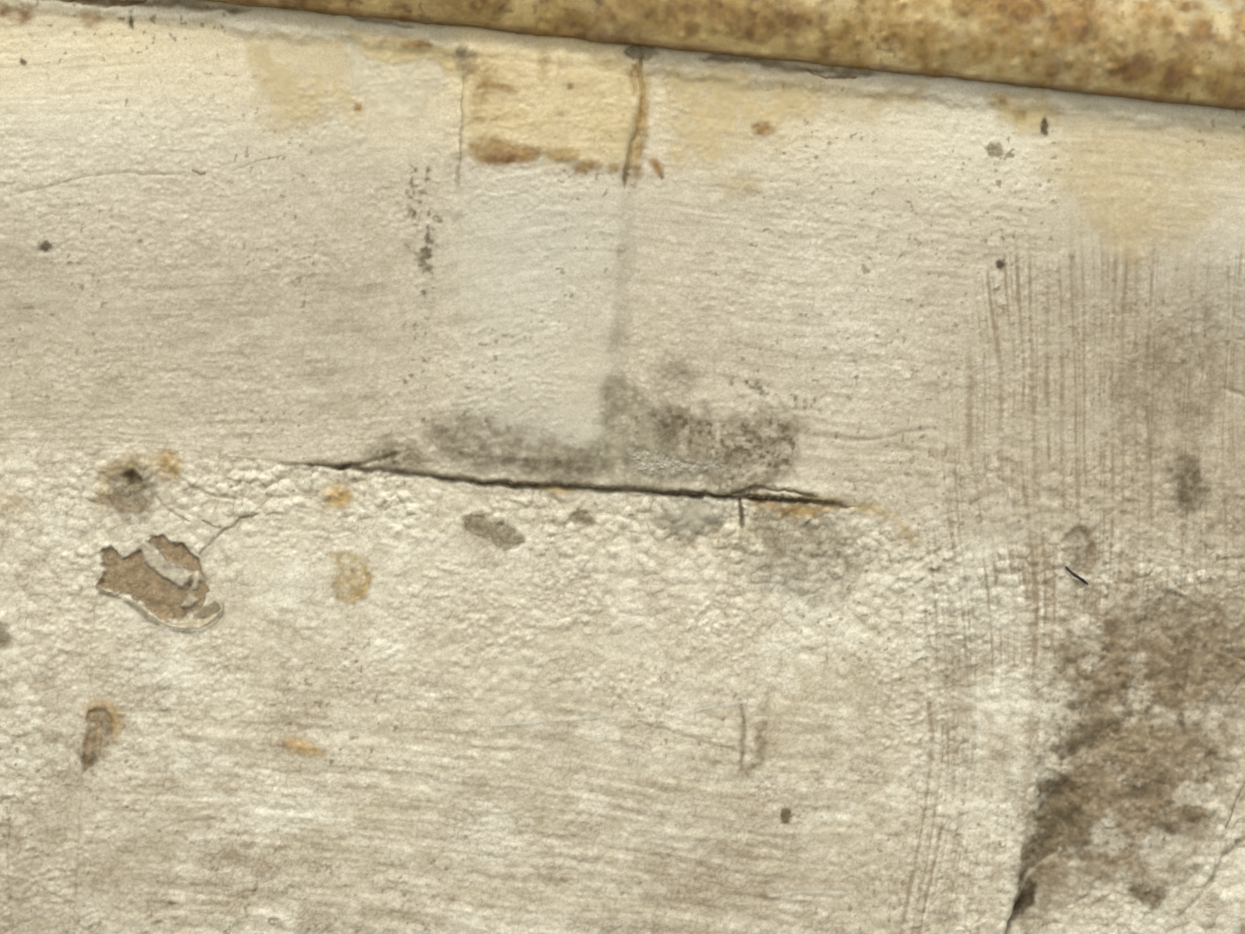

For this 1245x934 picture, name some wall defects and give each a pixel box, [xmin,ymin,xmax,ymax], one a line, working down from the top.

water stain [350,33,451,111]
water stain [415,221,441,272]
water stain [382,443,426,467]
water stain [431,386,799,498]
crack [432,475,845,527]
spalling [96,535,223,633]